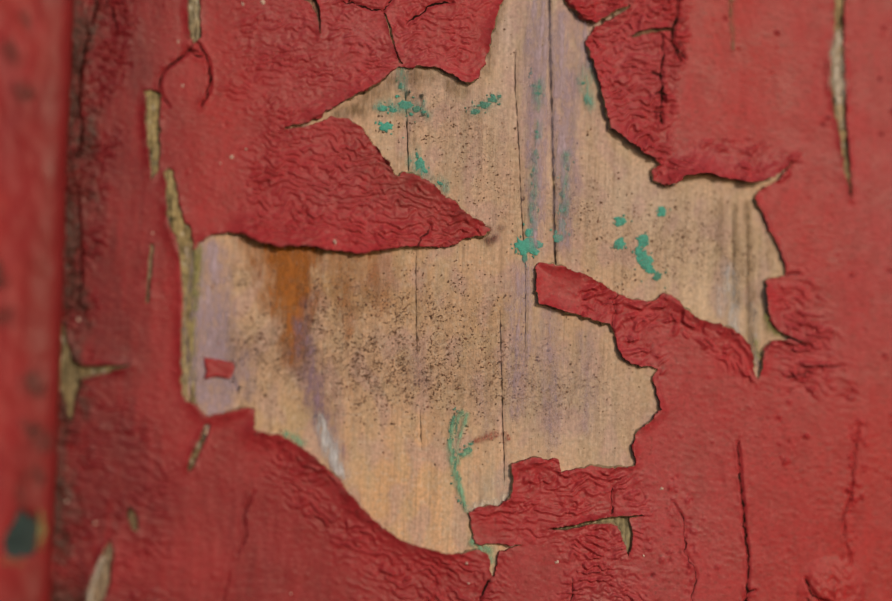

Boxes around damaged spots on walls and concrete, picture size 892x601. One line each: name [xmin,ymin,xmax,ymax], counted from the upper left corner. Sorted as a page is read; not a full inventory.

peeling [830,0,850,193]
rust [262,242,315,365]
peeling [145,0,798,576]
peeling [3,508,39,559]
peeling [86,541,113,601]
crack [737,442,755,601]